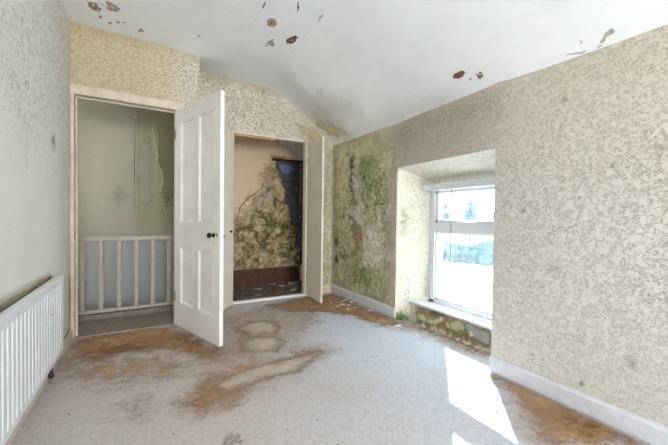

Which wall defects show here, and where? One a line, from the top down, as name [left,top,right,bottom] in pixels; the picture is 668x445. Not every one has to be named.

spalling [86,1,120,18]
spalling [283,11,325,62]
spalling [452,71,483,80]
flaking render [276,158,303,265]
damp [301,123,396,305]
peeling [415,305,491,348]